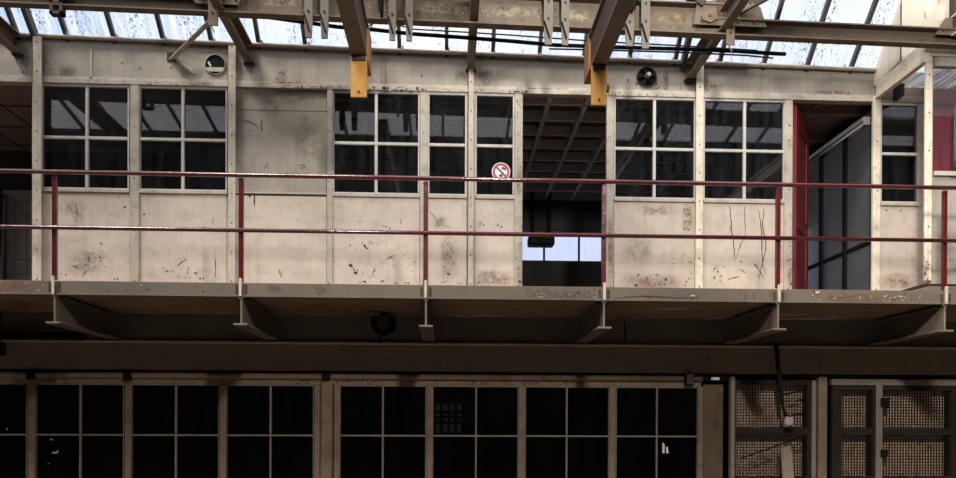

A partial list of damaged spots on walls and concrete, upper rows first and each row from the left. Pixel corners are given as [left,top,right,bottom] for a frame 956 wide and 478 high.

crack [729,205,767,300]